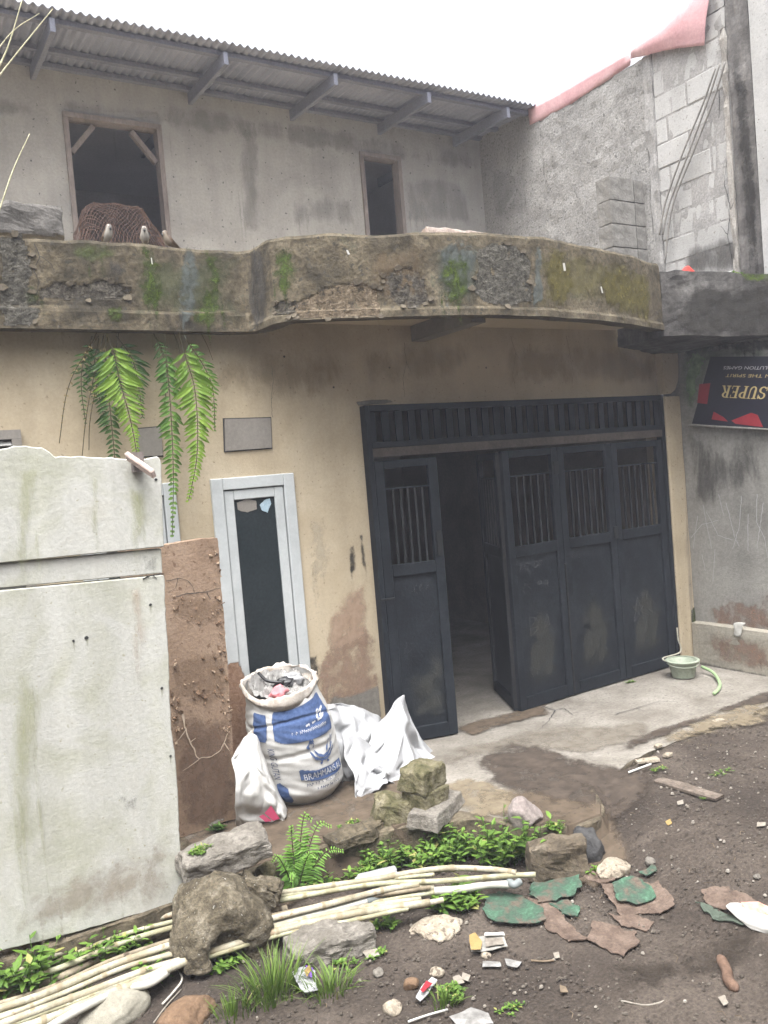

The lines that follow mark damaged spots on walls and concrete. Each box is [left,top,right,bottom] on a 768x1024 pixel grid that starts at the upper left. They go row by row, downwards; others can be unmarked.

leakage [678,72,768,355]
spalling [0,230,134,326]
spalling [271,264,434,321]
spalling [467,241,534,309]
peeling [319,589,381,717]
crack [178,714,230,771]